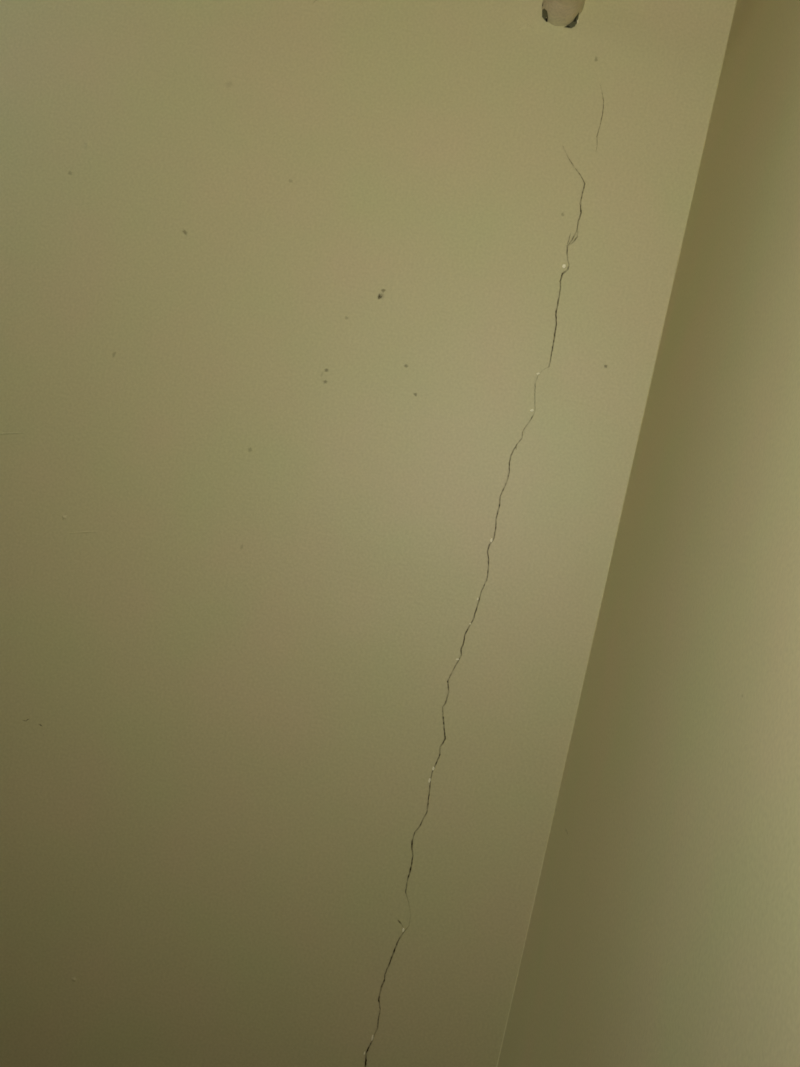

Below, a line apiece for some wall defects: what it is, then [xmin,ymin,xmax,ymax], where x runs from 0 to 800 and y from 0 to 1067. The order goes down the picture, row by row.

crack [364,921,404,1066]